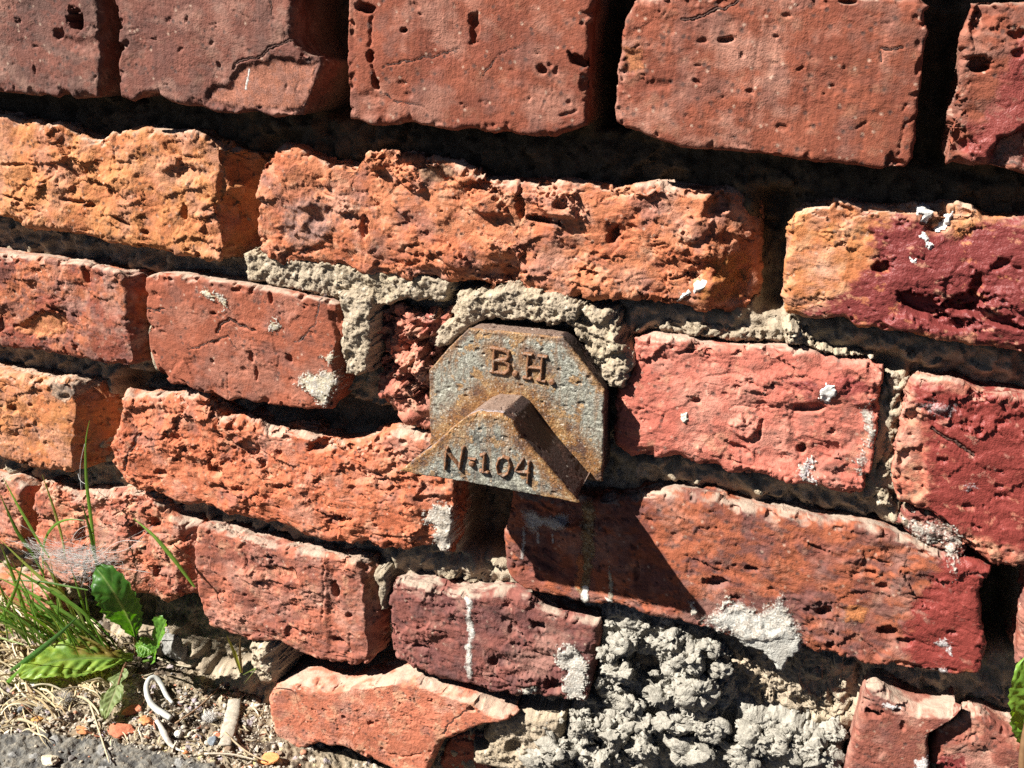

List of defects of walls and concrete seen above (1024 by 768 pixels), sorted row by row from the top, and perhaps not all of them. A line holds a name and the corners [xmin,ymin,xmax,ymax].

crack [235,39,294,65]